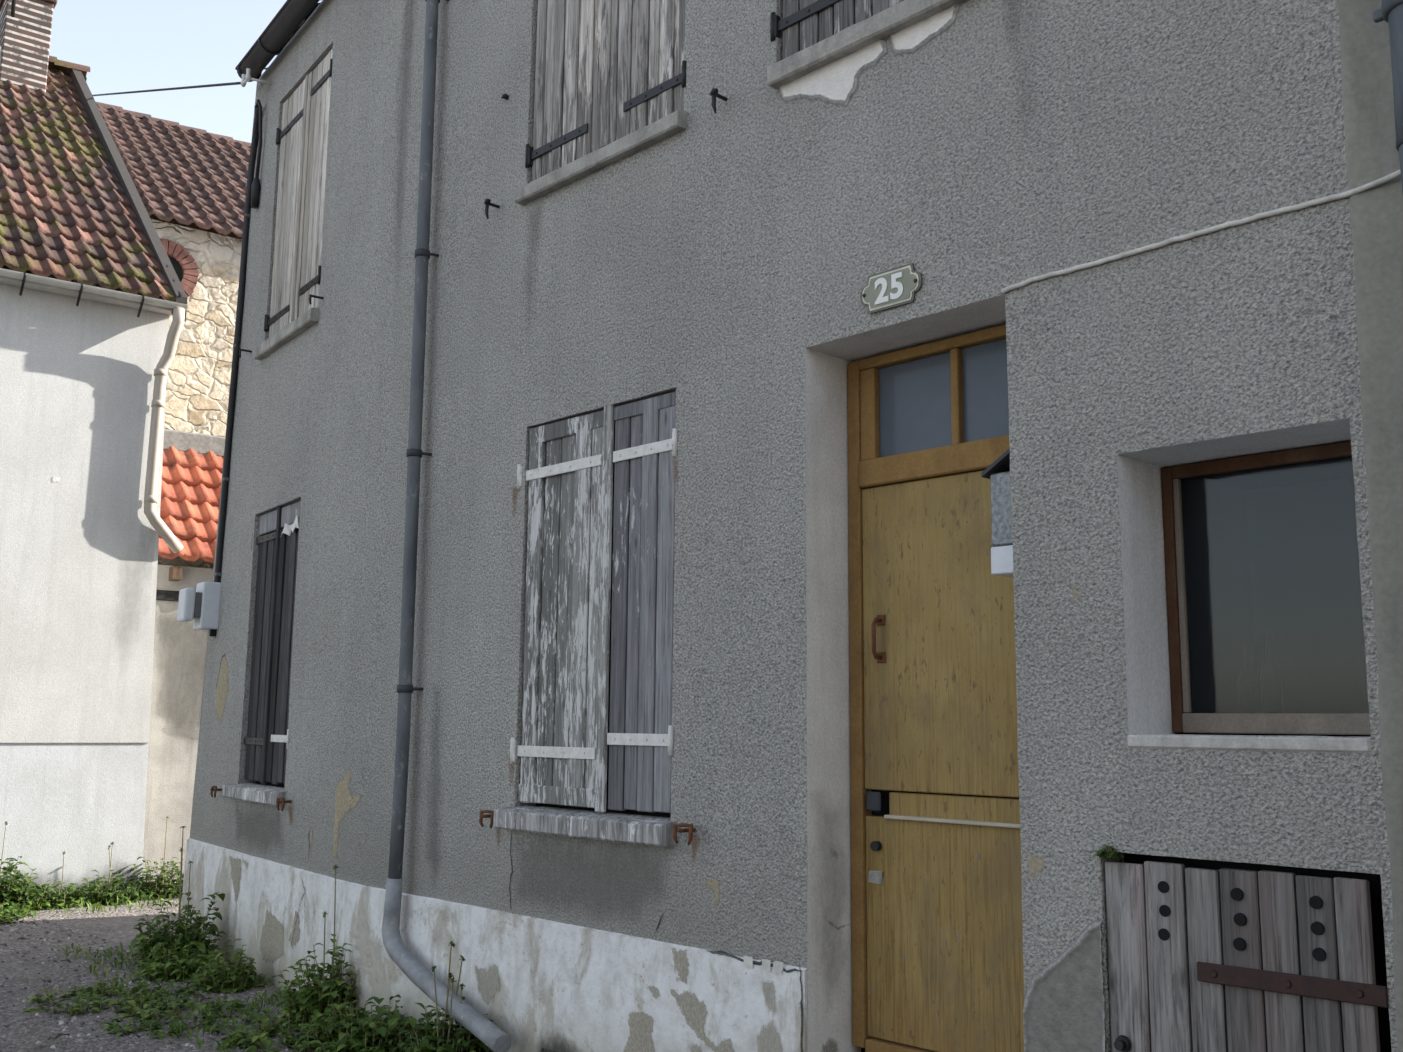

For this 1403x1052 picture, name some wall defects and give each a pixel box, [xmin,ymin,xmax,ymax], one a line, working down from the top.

flaking render [778,3,960,106]
peeling [229,856,248,902]
peeling [260,910,300,963]
peeling [475,965,500,1005]
peeling [648,948,734,1052]
peeling [624,1012,655,1052]